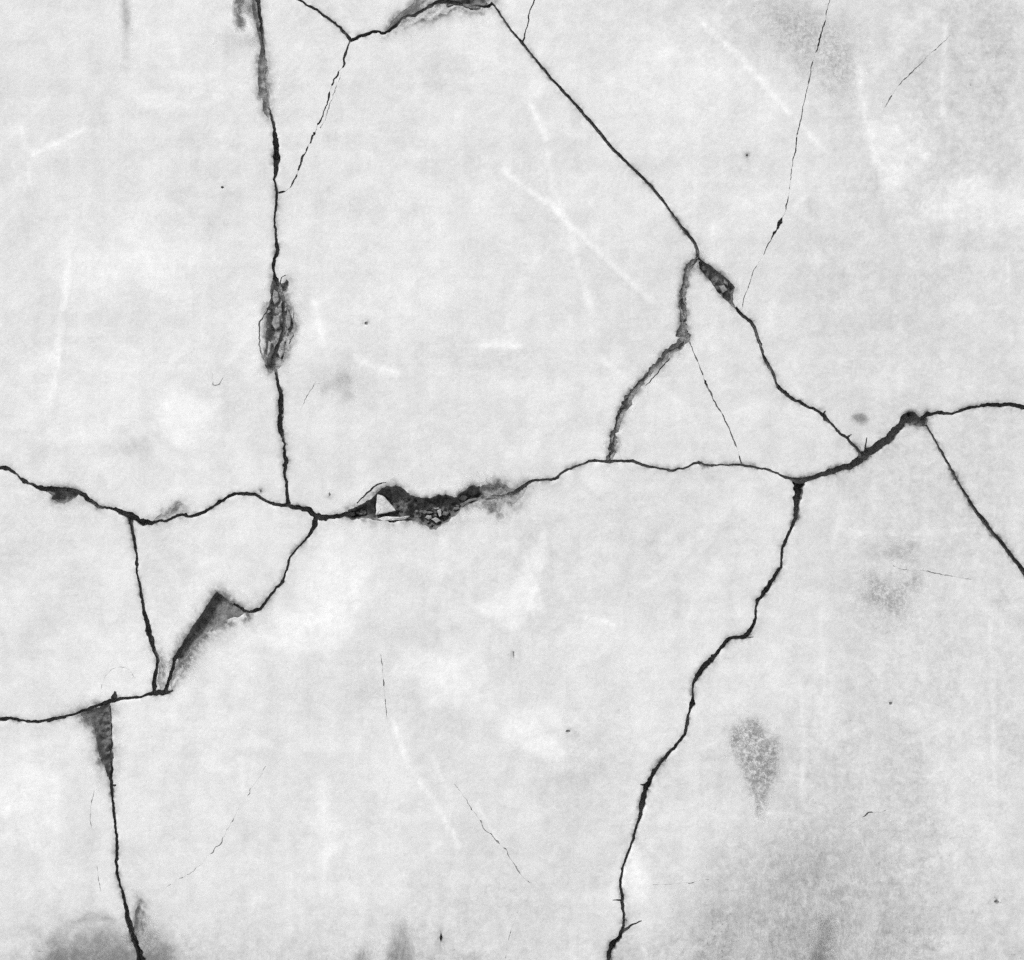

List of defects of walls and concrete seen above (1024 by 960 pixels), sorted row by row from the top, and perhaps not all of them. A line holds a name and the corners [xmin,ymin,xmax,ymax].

crack [885,39,947,107]
flaking render [264,278,297,373]
crack [0,0,355,960]
flaking render [344,480,527,530]
crack [298,0,909,960]
crack [920,402,1024,576]
flaking render [155,591,250,690]